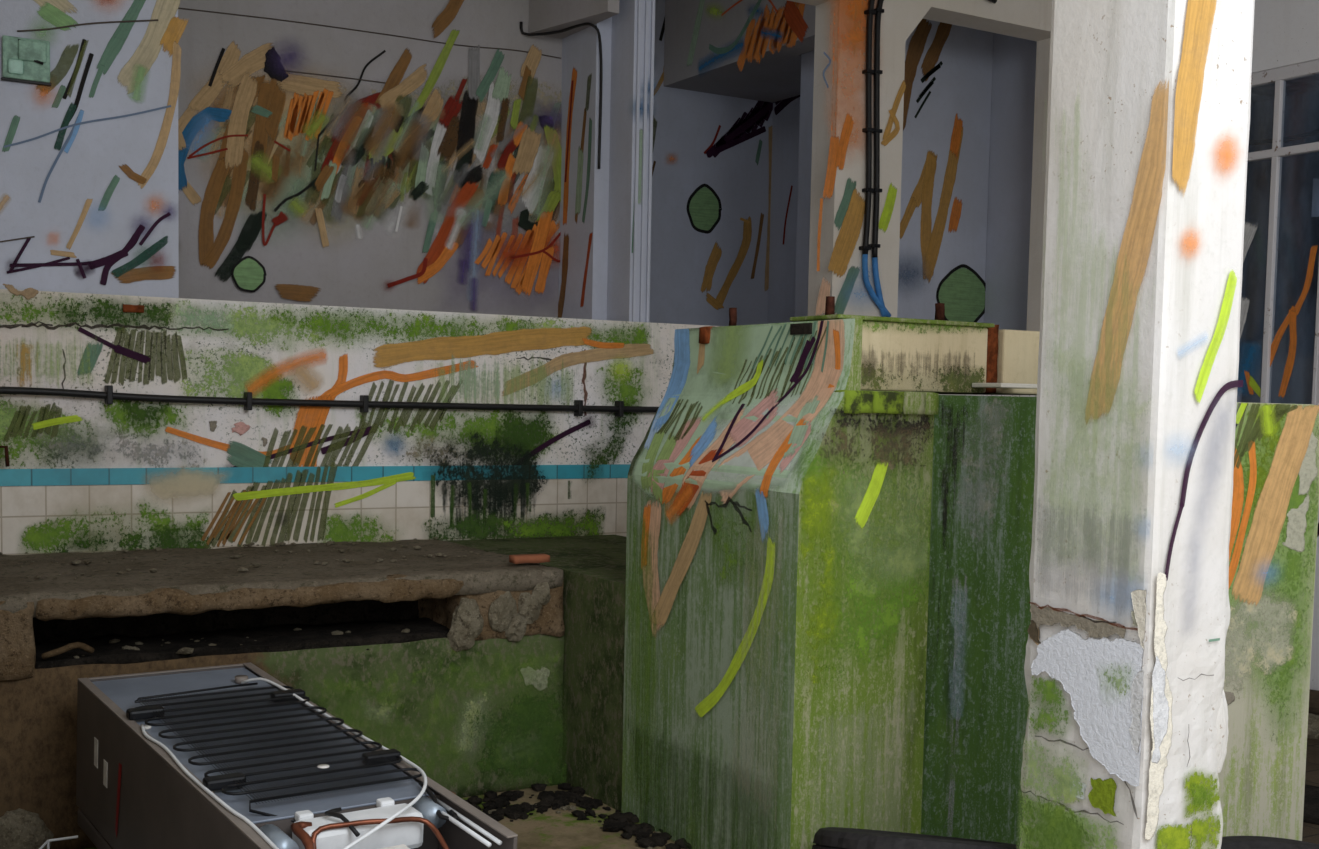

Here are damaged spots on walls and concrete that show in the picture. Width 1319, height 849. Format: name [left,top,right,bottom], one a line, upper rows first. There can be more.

crack [0,321,229,389]
water stain [35,429,205,468]
water stain [817,408,934,480]
spalling [418,582,565,652]
peeling [1028,572,1173,840]